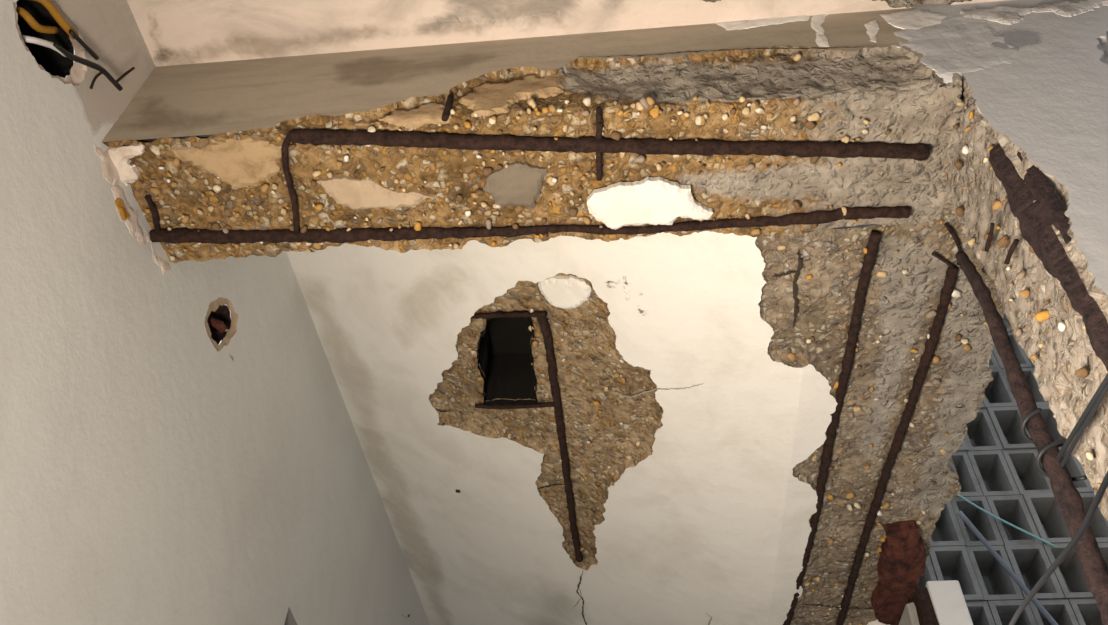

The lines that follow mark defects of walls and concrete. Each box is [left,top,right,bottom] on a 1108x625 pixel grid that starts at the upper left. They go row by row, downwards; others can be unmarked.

spalling [872,0,1108,25]
spalling [1096,30,1108,64]
spalling [93,45,1108,439]
spalling [429,273,663,571]
spalling [755,196,1055,625]
spalling [1069,392,1108,495]
spalling [1041,445,1086,539]
spalling [1098,487,1108,521]
crack [573,572,587,625]
corrosion [912,587,939,625]
spalling [1074,525,1108,625]